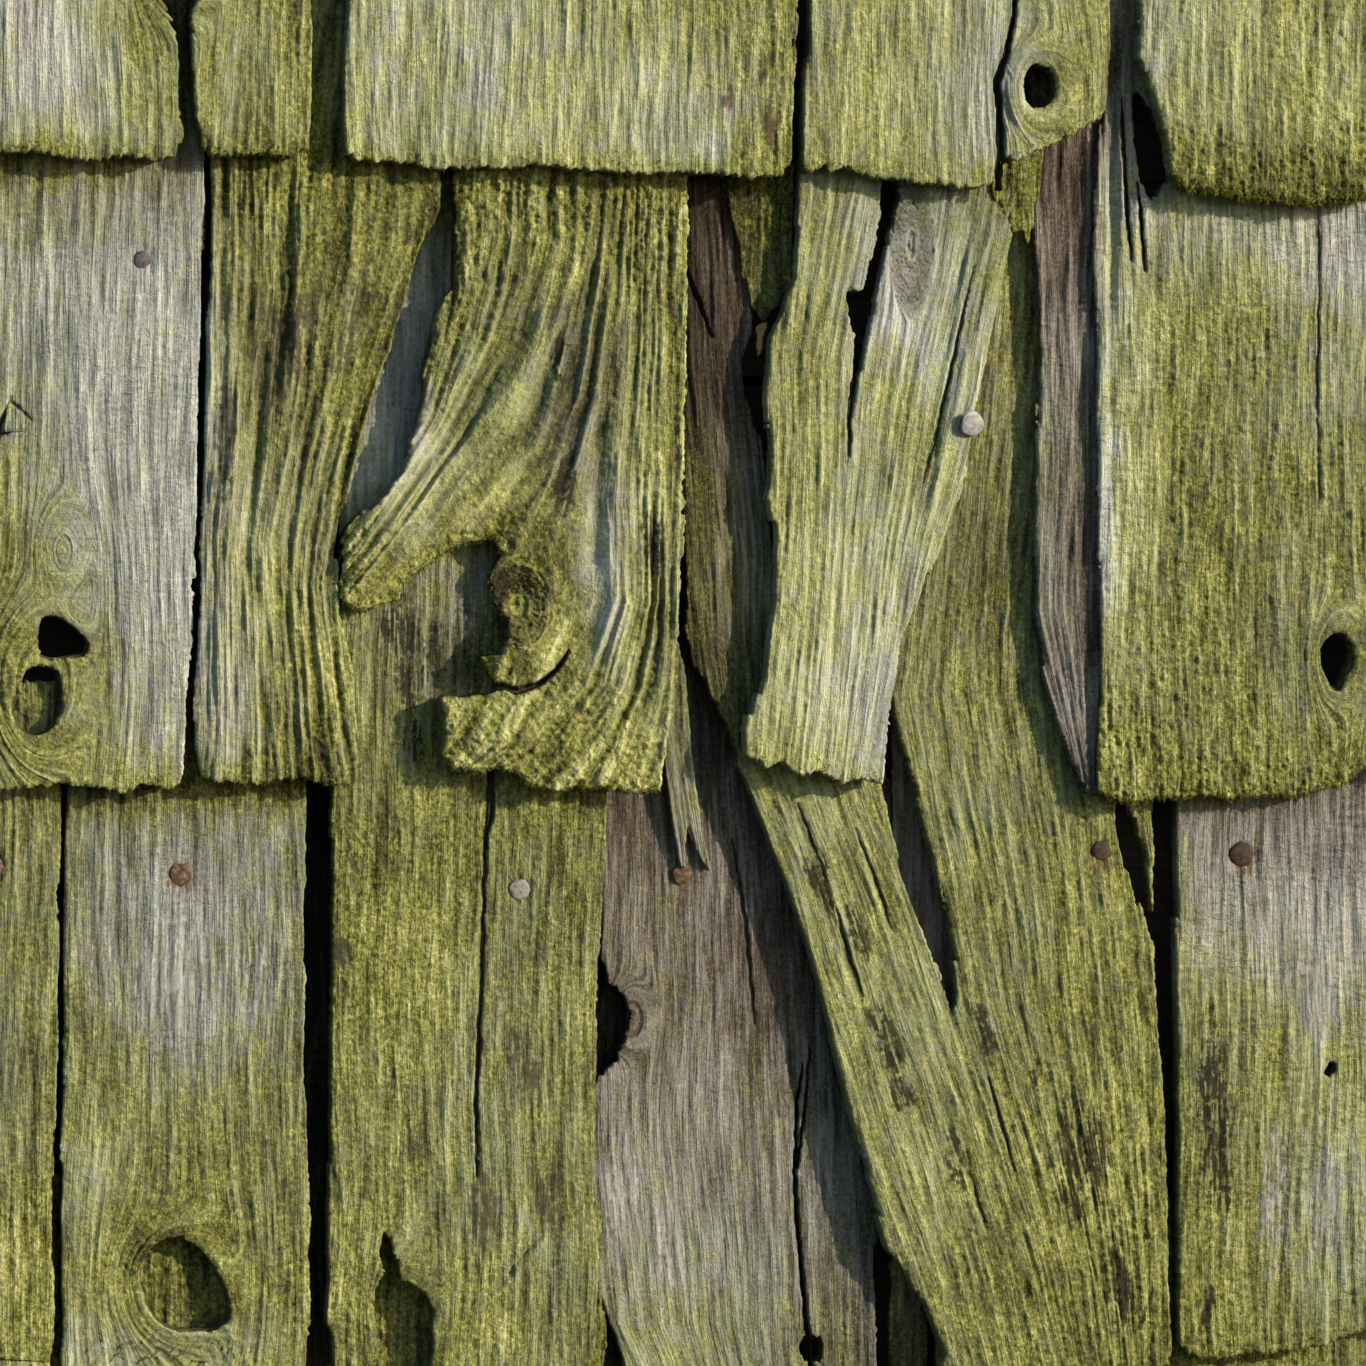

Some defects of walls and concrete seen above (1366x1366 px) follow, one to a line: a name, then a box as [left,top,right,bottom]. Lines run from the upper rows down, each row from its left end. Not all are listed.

crack [994,0,1017,191]
crack [847,381,855,456]
crack [474,769,495,1177]
crack [792,1051,812,1366]